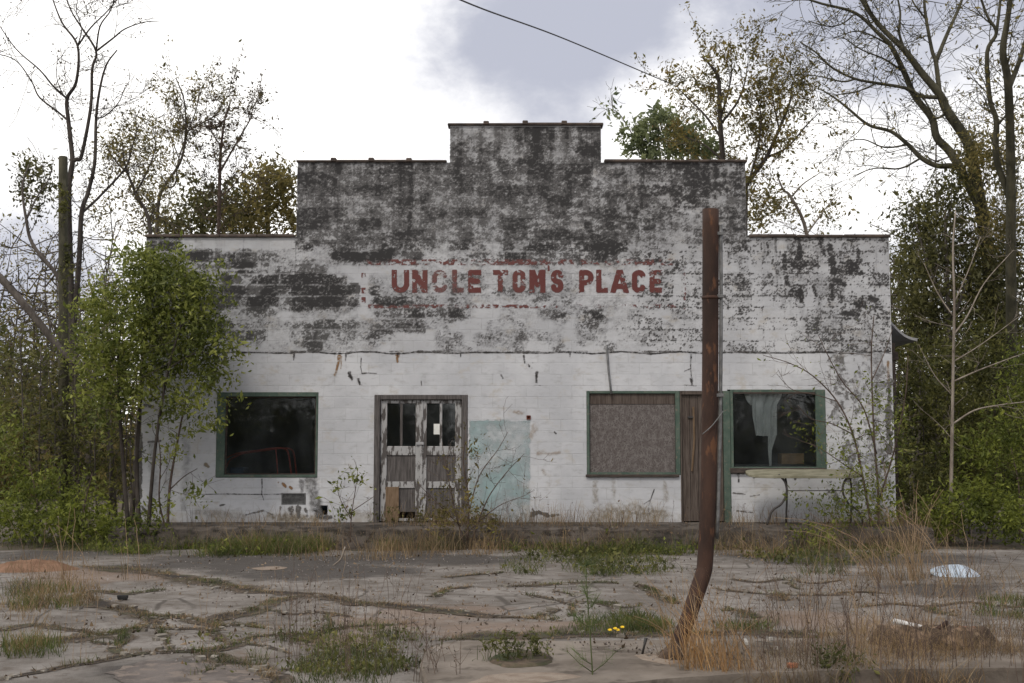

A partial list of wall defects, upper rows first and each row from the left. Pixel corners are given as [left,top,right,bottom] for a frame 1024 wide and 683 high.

water stain [297,127,745,272]
water stain [198,295,367,352]
water stain [773,304,850,352]